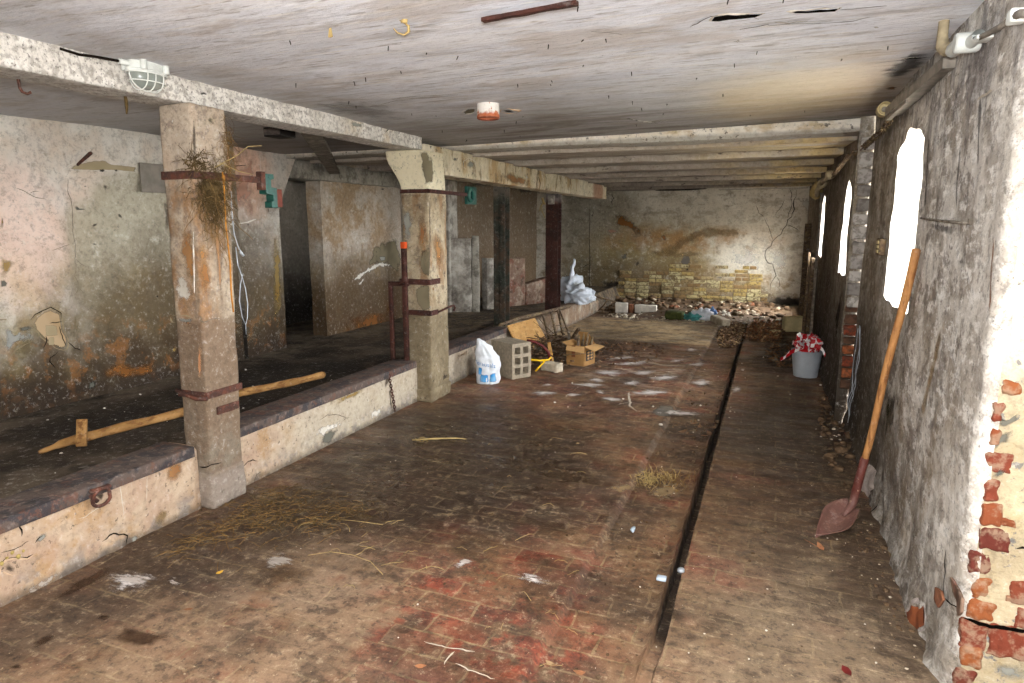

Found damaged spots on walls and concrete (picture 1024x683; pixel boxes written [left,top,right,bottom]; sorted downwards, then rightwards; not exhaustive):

damp [616,215,640,234]
damp [654,228,738,257]
crack [756,190,799,290]
flaking render [0,306,80,367]
corrosion [107,365,152,376]
flaking render [904,379,1024,683]
crack [943,552,1024,633]